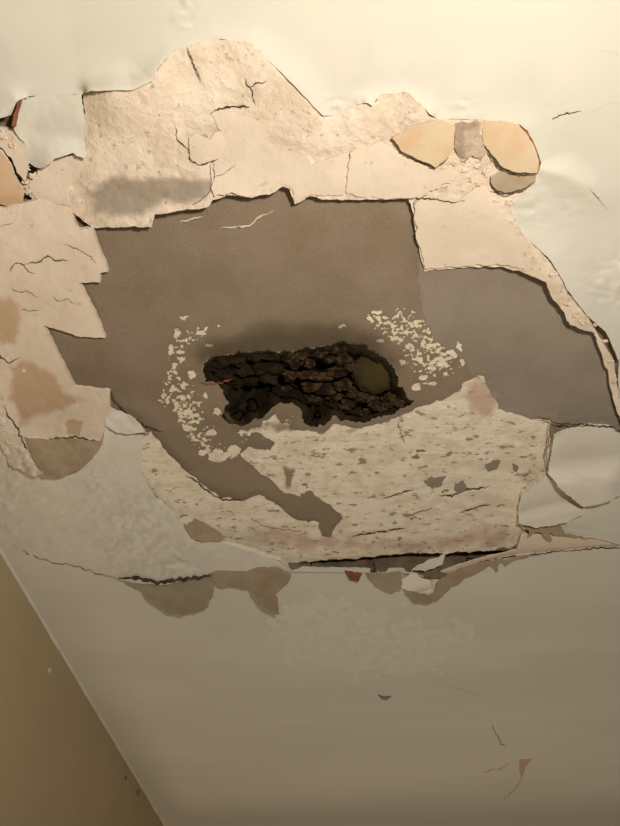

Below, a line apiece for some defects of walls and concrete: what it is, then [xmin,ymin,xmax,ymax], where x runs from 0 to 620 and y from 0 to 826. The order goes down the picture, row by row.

crack [552,102,620,120]
crack [10,244,96,312]
spalling [0,38,620,616]